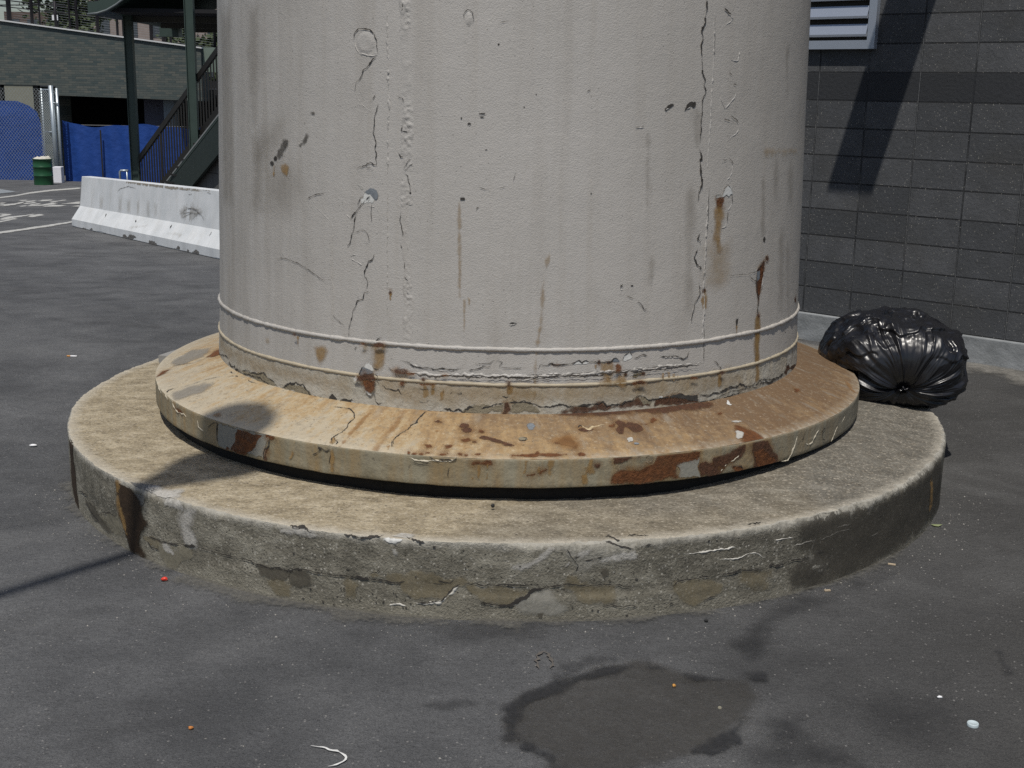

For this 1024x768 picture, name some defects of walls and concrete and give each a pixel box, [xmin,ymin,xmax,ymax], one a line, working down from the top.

crack [354,28,378,168]
crack [695,1,708,201]
corrosion [730,256,769,381]
spalling [219,354,355,403]
peeling [353,363,380,405]
crack [382,360,526,446]
peeling [521,352,647,381]
spalling [439,364,796,432]
corrosion [216,422,274,461]
crack [290,406,355,472]
corrosion [407,423,600,484]
corrosion [611,420,778,484]